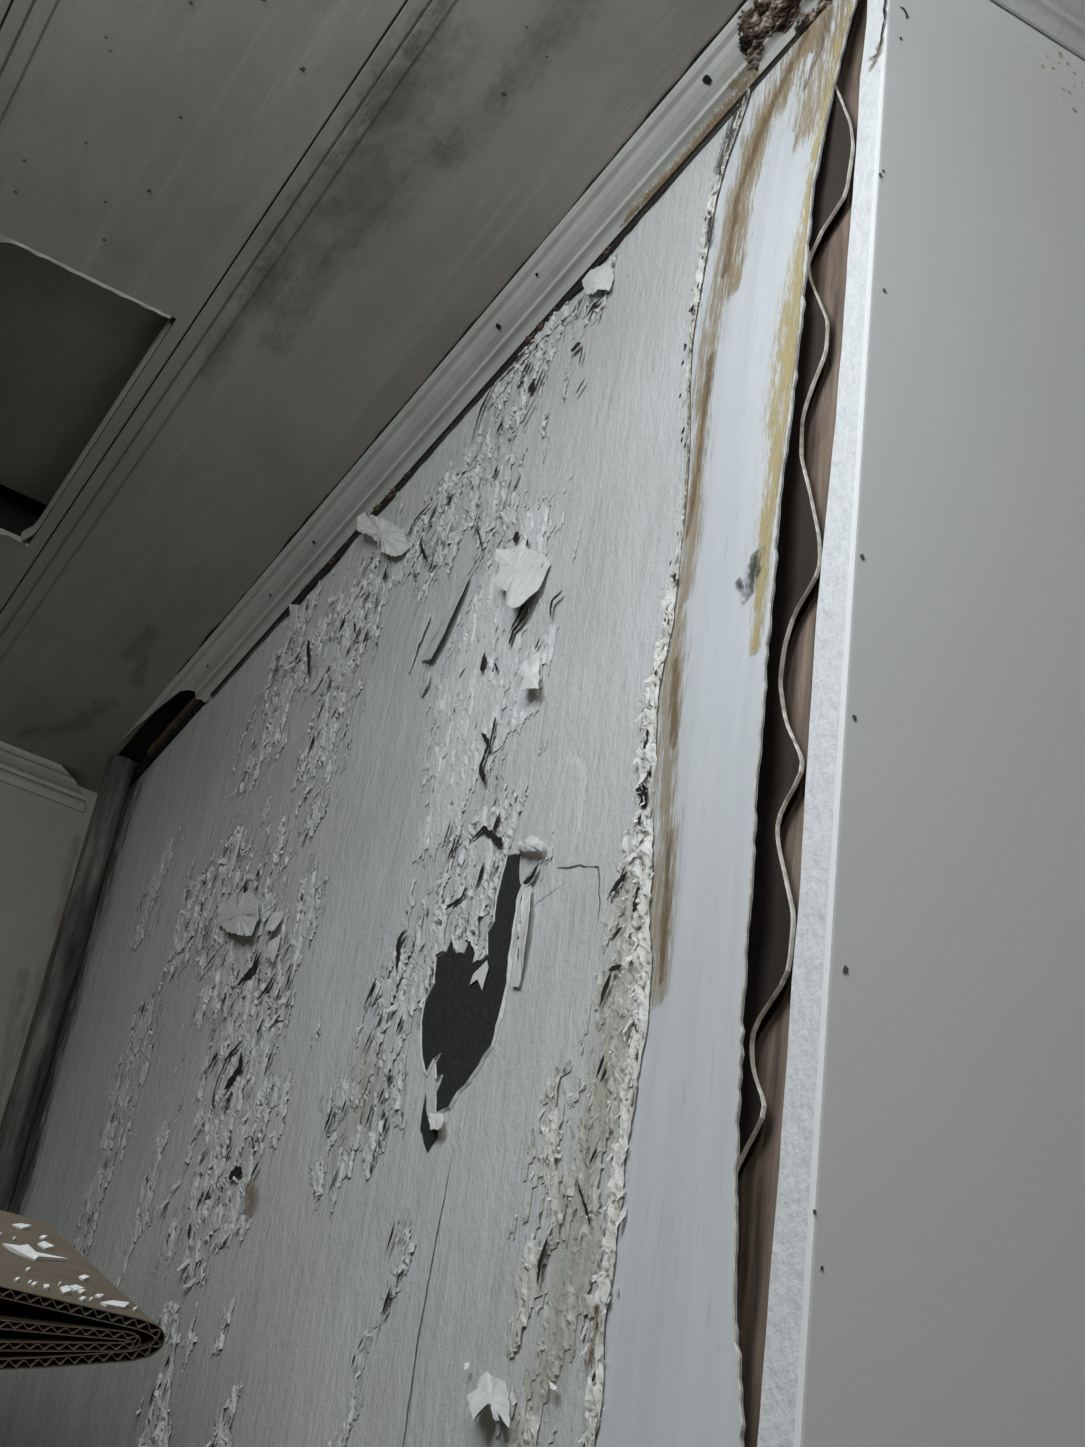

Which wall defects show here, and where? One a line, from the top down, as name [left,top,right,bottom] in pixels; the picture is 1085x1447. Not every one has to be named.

peeling [69,254,640,1447]
leakage [649,0,853,1006]